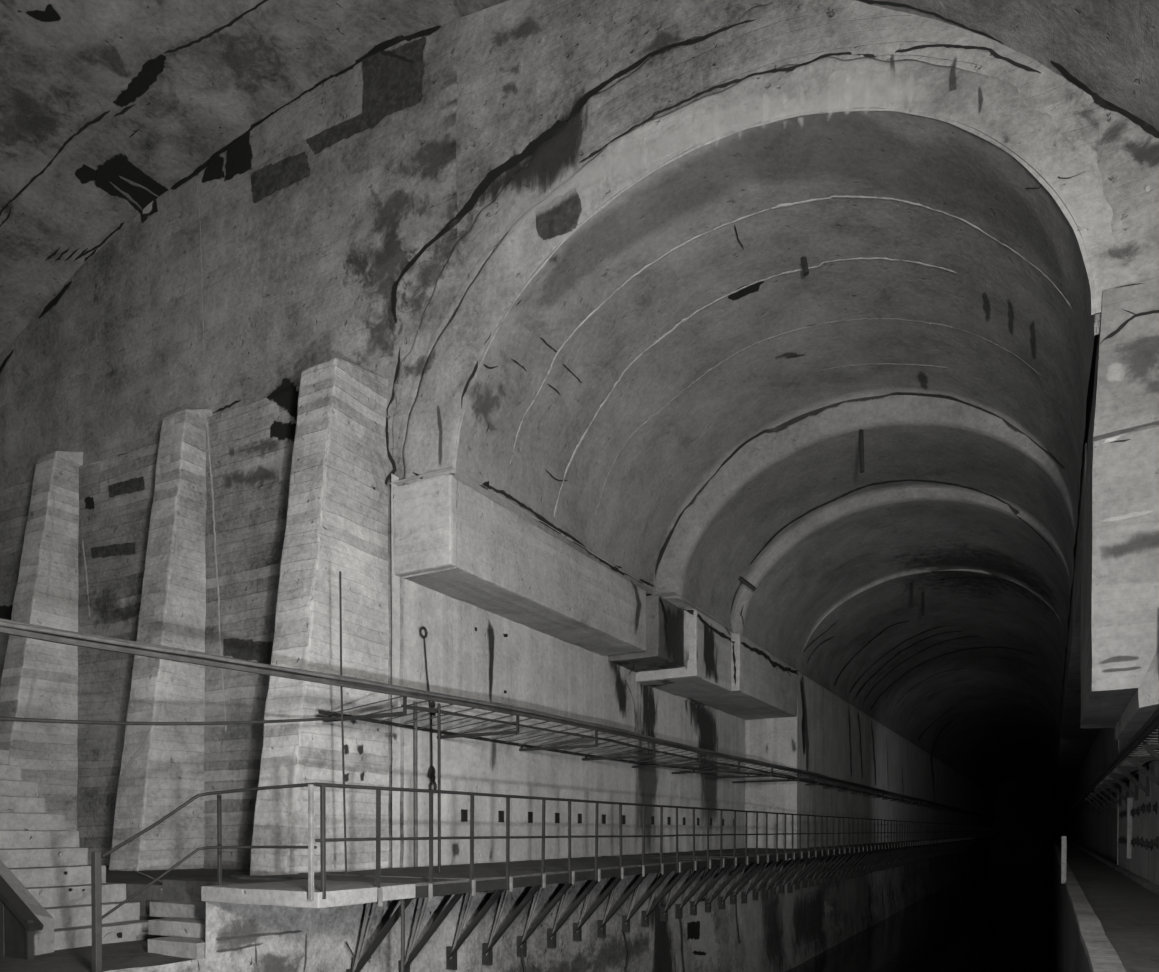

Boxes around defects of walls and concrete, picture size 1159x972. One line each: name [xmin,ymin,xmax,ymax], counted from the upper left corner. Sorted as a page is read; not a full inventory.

spalling [18,4,61,22]
crack [0,110,110,227]
spalling [75,153,169,223]
spalling [113,55,166,117]
crack [164,0,268,54]
crack [171,26,442,190]
peeling [202,37,426,203]
peeling [536,188,582,240]
crack [371,19,756,497]
crack [579,0,1041,163]
leakage [610,661,674,850]
leakage [686,699,717,826]